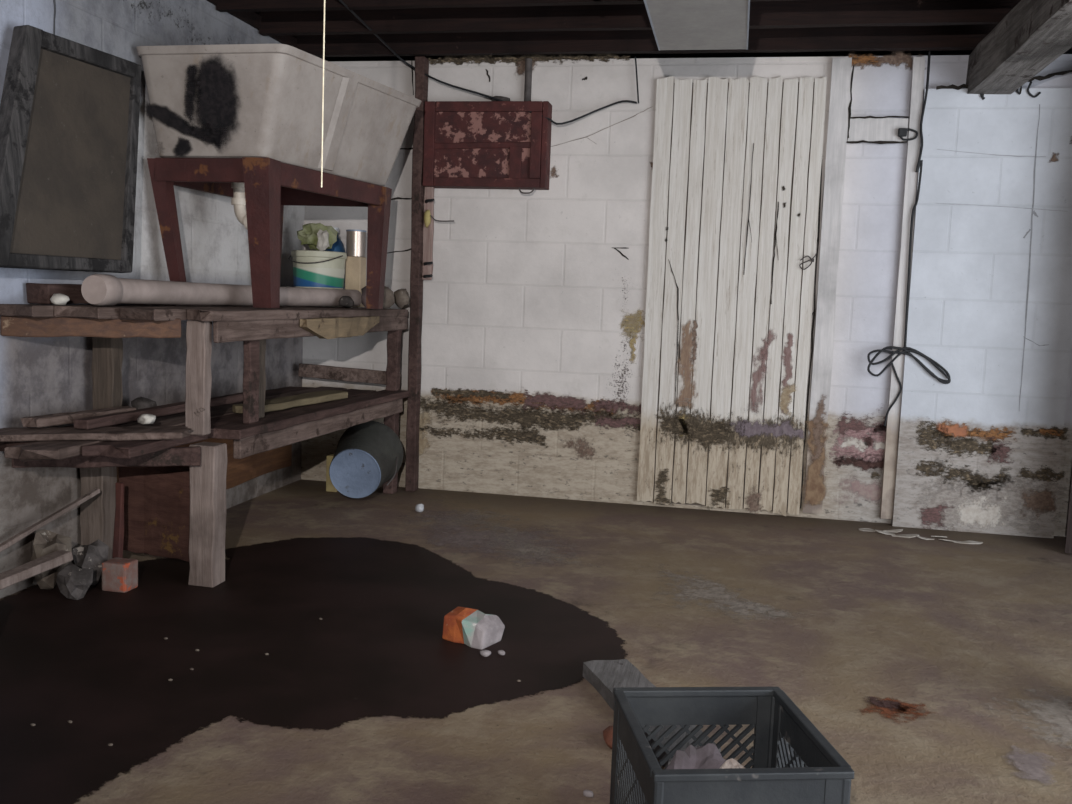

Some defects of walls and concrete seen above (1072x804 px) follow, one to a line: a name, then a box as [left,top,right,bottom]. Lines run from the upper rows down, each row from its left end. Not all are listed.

leakage [621,310,645,363]
leakage [419,320,886,506]
leakage [914,421,1064,492]
leakage [706,486,730,512]
leakage [745,488,762,515]
leakage [0,537,628,804]
corrosion [860,696,929,722]